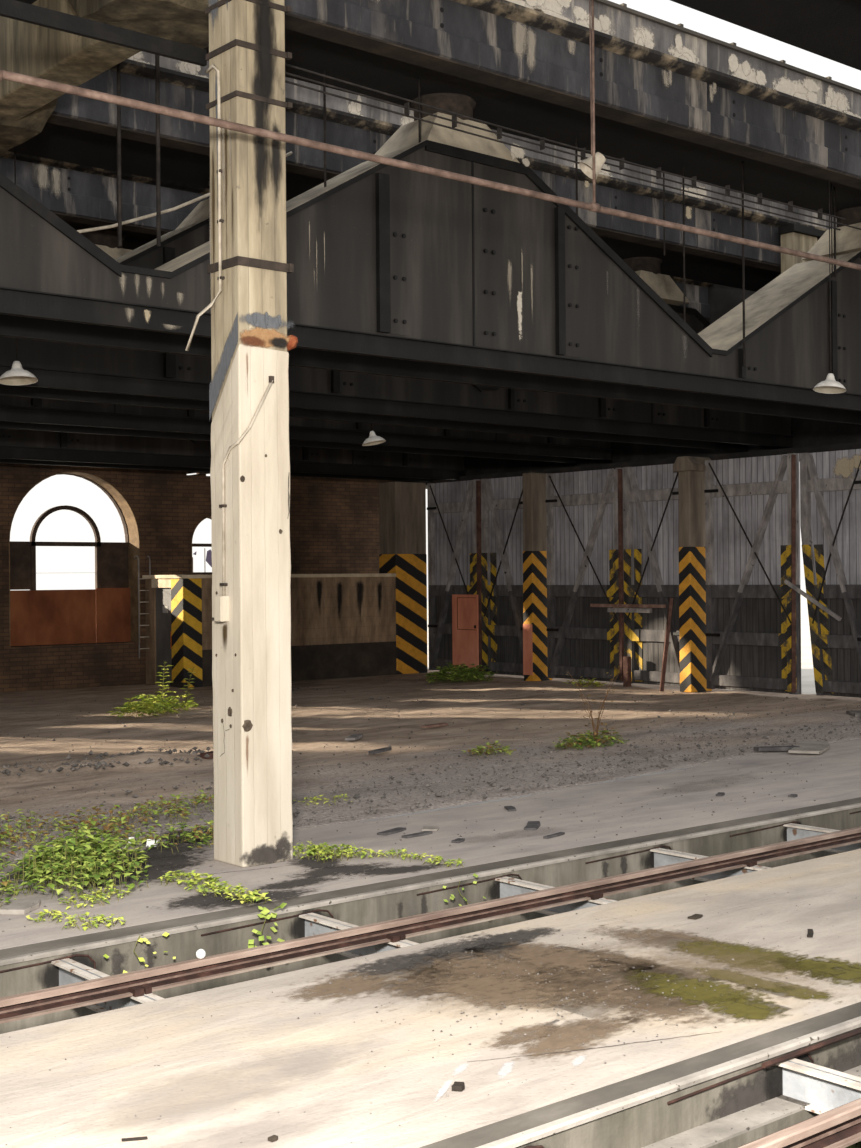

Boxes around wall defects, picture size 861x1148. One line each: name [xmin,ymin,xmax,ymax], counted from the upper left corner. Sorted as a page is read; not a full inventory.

peeling [506,0,611,35]
peeling [633,27,654,49]
peeling [668,34,699,63]
leakage [254,0,281,205]
peeling [728,54,861,118]
peeling [511,144,530,167]
leakage [492,1016,637,1057]